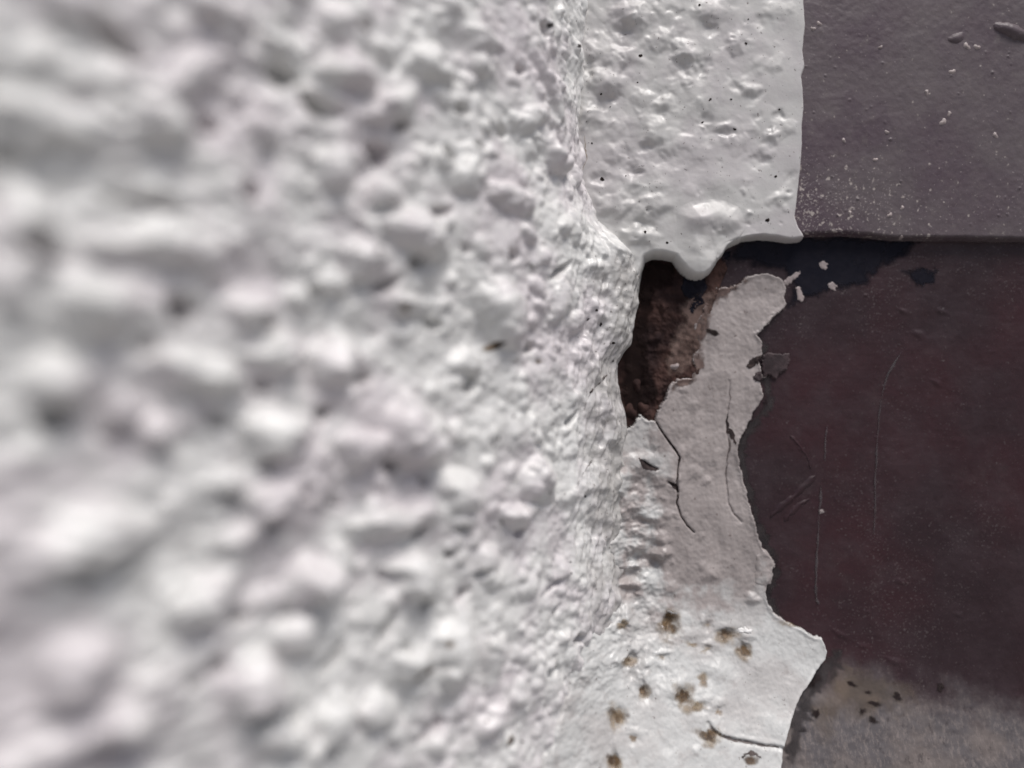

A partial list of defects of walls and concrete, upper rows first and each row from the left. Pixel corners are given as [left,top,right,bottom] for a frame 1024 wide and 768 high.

spalling [617,236,914,428]
crack [725,391,740,519]
crack [639,422,692,530]
corrosion [661,613,676,633]
corrosion [719,630,750,660]
corrosion [676,690,702,712]
corrosion [610,710,623,726]
corrosion [701,730,716,747]
corrosion [608,756,621,768]
spalling [742,750,761,764]